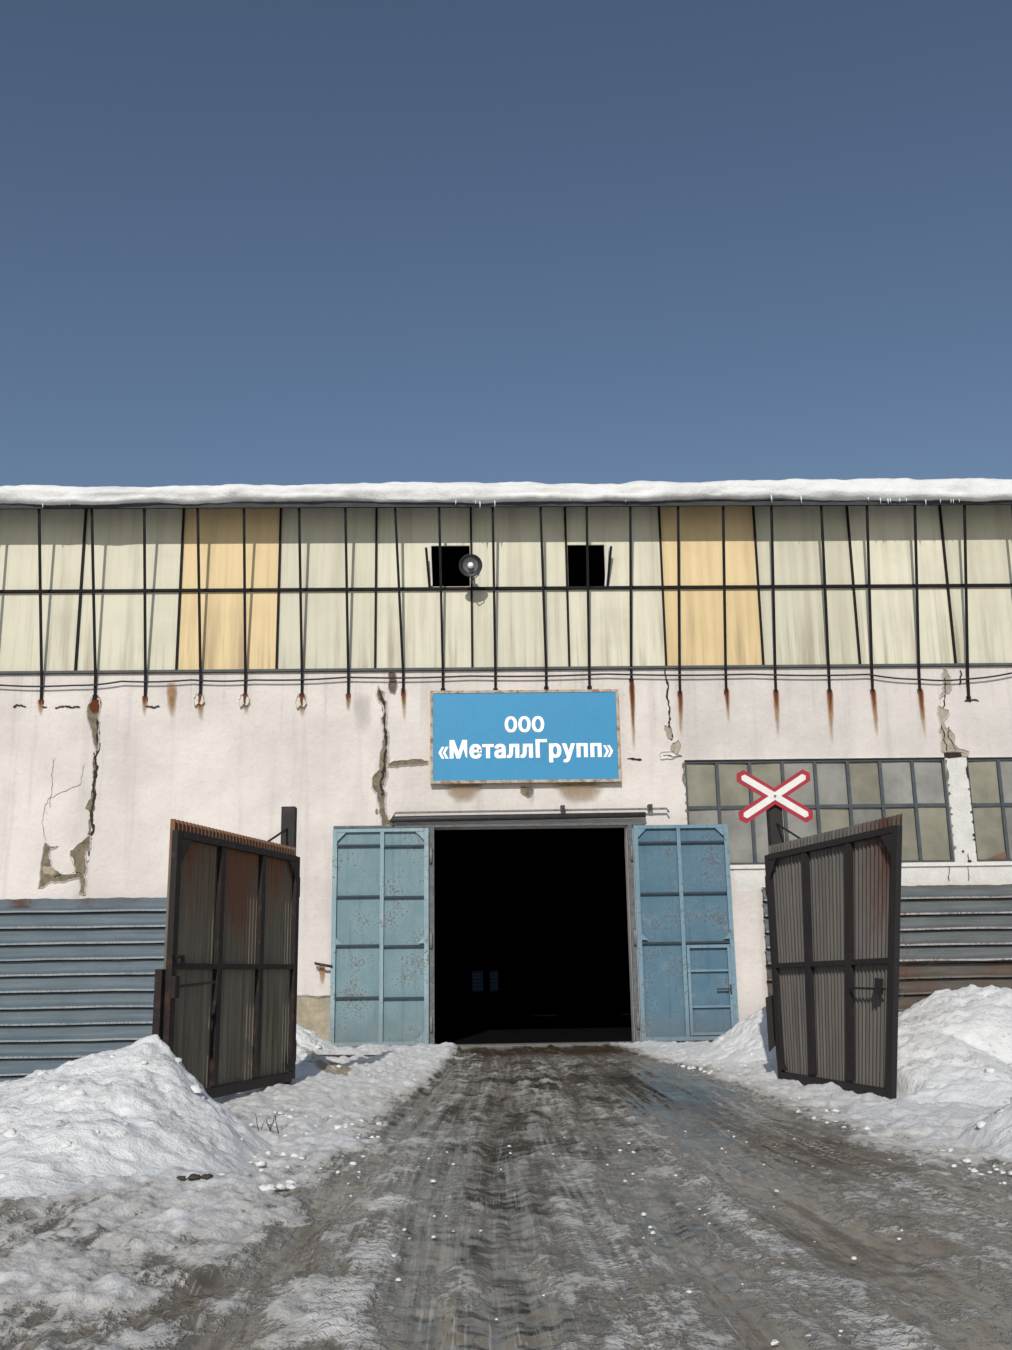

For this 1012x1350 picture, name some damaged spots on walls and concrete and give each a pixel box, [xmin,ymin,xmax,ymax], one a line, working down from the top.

crack [13,696,101,863]
crack [371,684,429,825]
spalling [38,835,92,896]